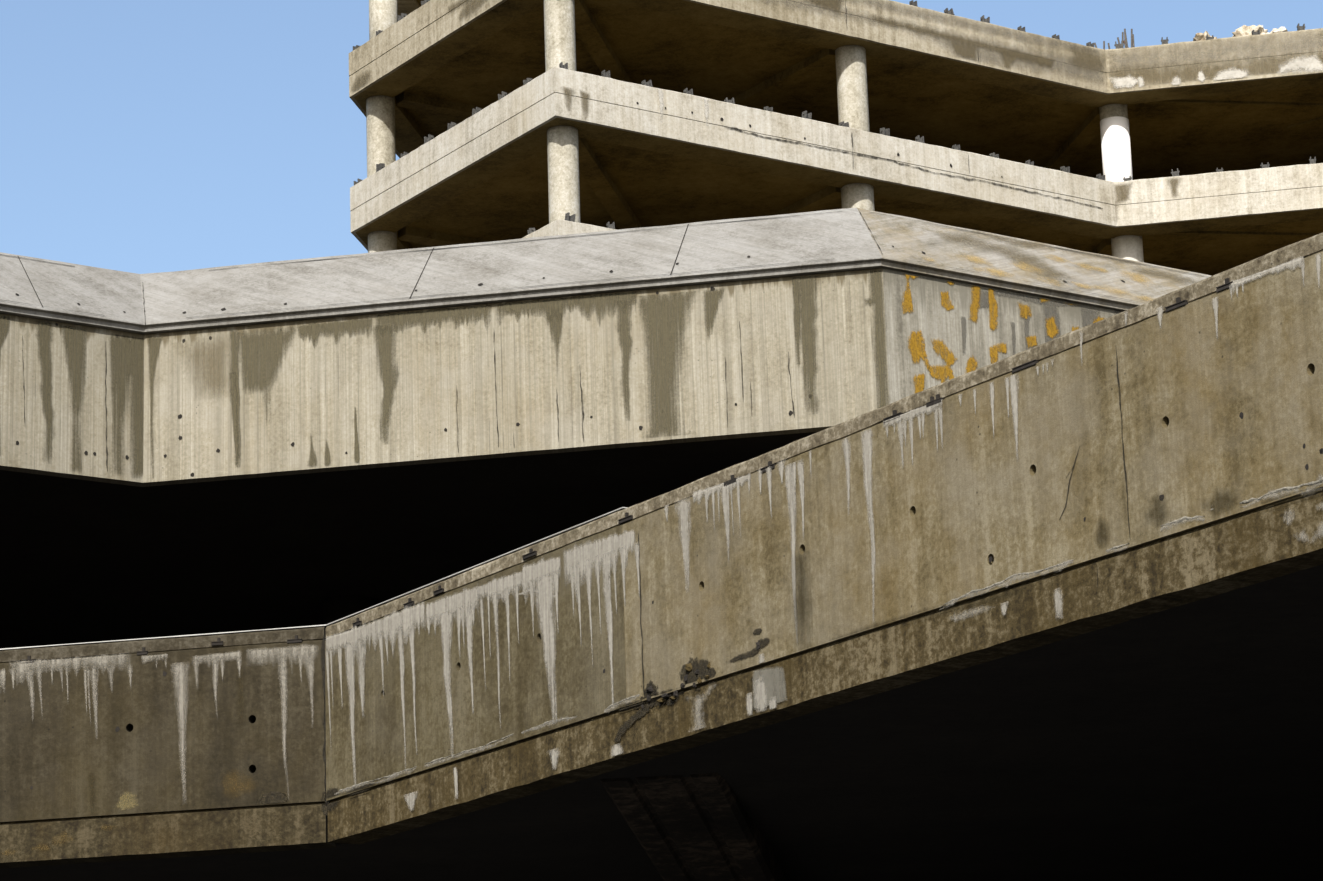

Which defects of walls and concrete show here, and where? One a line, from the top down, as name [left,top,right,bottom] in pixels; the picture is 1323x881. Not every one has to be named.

spalling [397,0,424,22]
leakage [0,315,10,349]
leakage [37,320,86,471]
leakage [111,335,162,476]
leakage [196,289,724,466]
leakage [792,275,818,413]
leakage [843,270,943,627]
leakage [665,452,811,631]
leakage [0,531,640,797]
leakage [405,792,415,810]